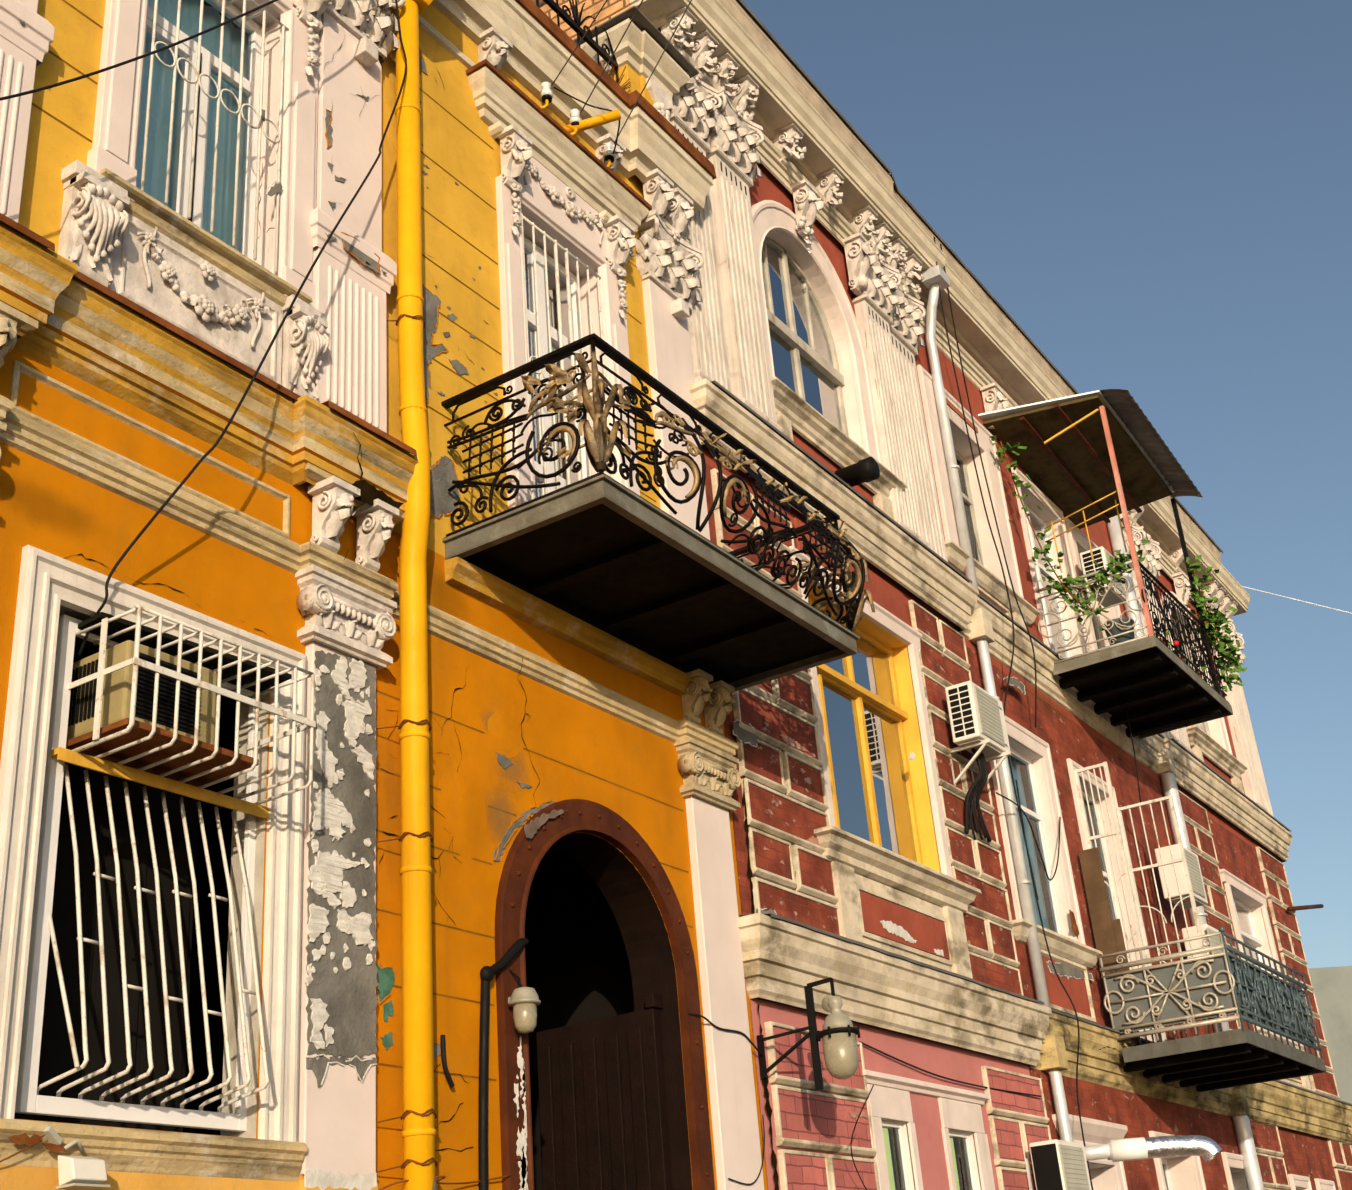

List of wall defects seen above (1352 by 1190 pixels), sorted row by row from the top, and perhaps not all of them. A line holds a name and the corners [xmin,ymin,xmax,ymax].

peeling [325,109,346,183]
flaking render [422,283,485,408]
crack [433,670,467,773]
flaking render [495,752,513,769]
crack [519,655,540,805]
peeling [305,650,395,1088]
flaking render [493,799,569,862]
peeling [880,920,917,944]
peeling [513,1036,528,1190]